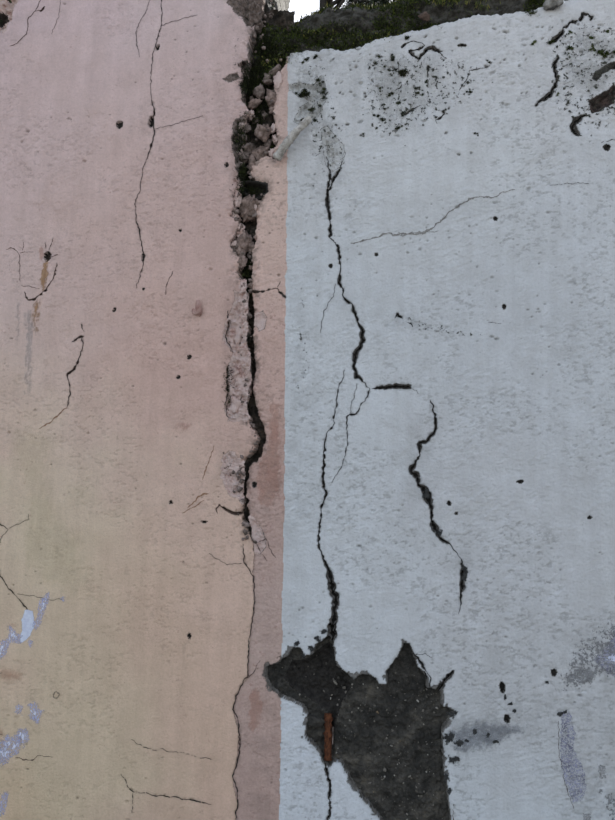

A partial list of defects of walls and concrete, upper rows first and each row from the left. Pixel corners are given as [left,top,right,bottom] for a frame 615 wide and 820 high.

spalling [0,0,18,33]
crack [134,0,198,288]
spalling [224,115,247,172]
crack [6,239,58,301]
crack [40,324,84,429]
crack [215,0,295,818]
crack [317,156,515,641]
peeling [0,593,50,659]
crack [413,652,454,691]
spalling [267,622,451,820]
crack [121,775,211,809]
crack [323,761,331,820]